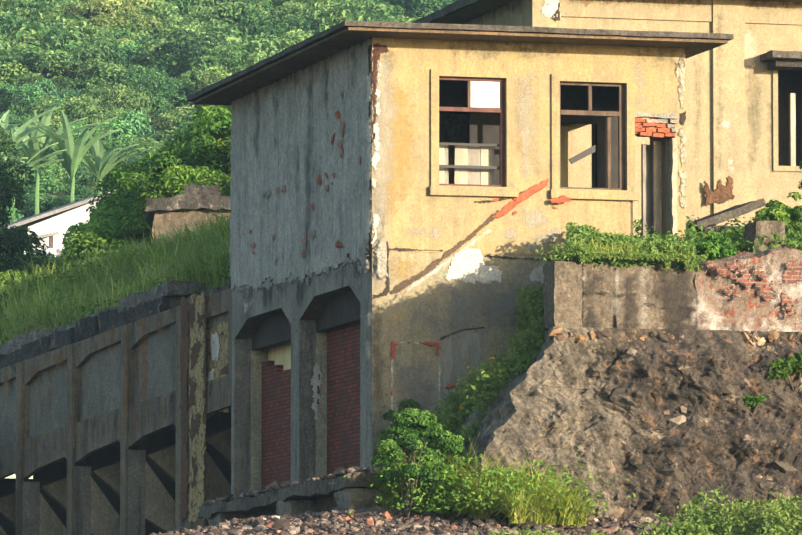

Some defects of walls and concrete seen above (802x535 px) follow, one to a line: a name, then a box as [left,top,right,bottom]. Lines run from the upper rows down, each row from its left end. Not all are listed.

spalling [358,43,389,188]
crack [474,191,523,204]
flaking render [492,178,549,227]
flaking render [550,195,571,210]
rust [703,176,735,207]
spalling [366,214,380,263]
flaking render [445,247,502,284]
crack [485,254,554,262]
flaking render [706,260,802,318]
peeling [179,291,228,524]